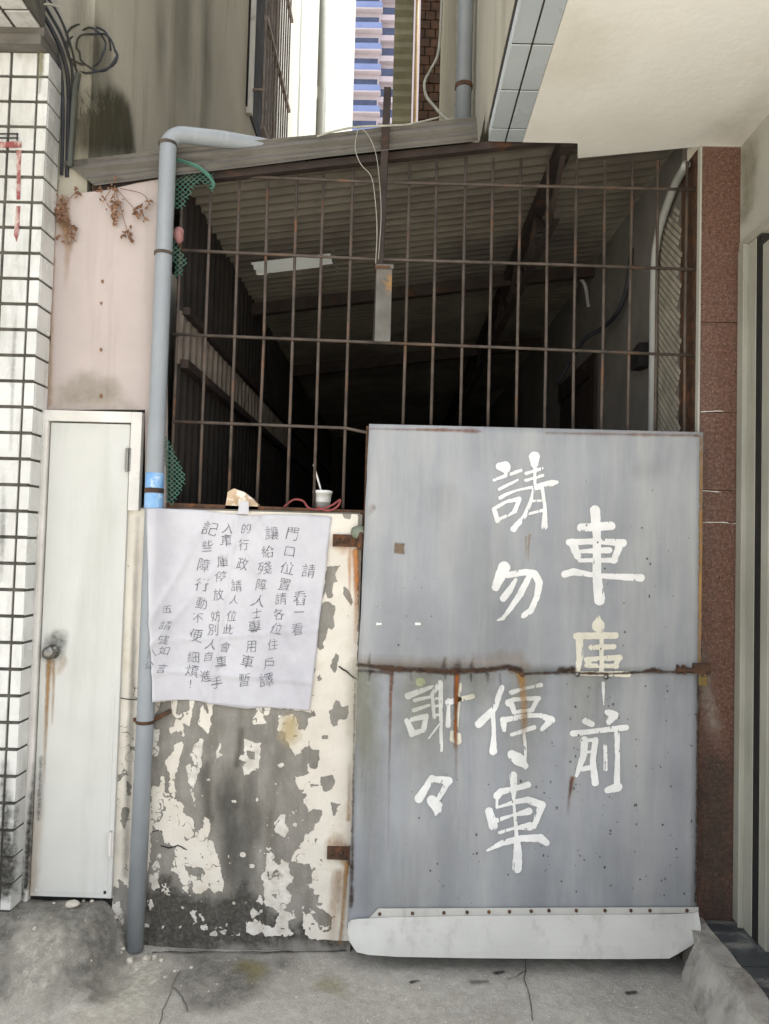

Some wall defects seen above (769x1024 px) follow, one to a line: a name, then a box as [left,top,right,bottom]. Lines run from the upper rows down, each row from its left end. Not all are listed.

rust [45,660,54,725]
rust [356,662,682,746]
peeling [117,726,135,829]
peeling [144,700,350,952]
peeling [112,879,129,931]
damp [144,876,339,949]